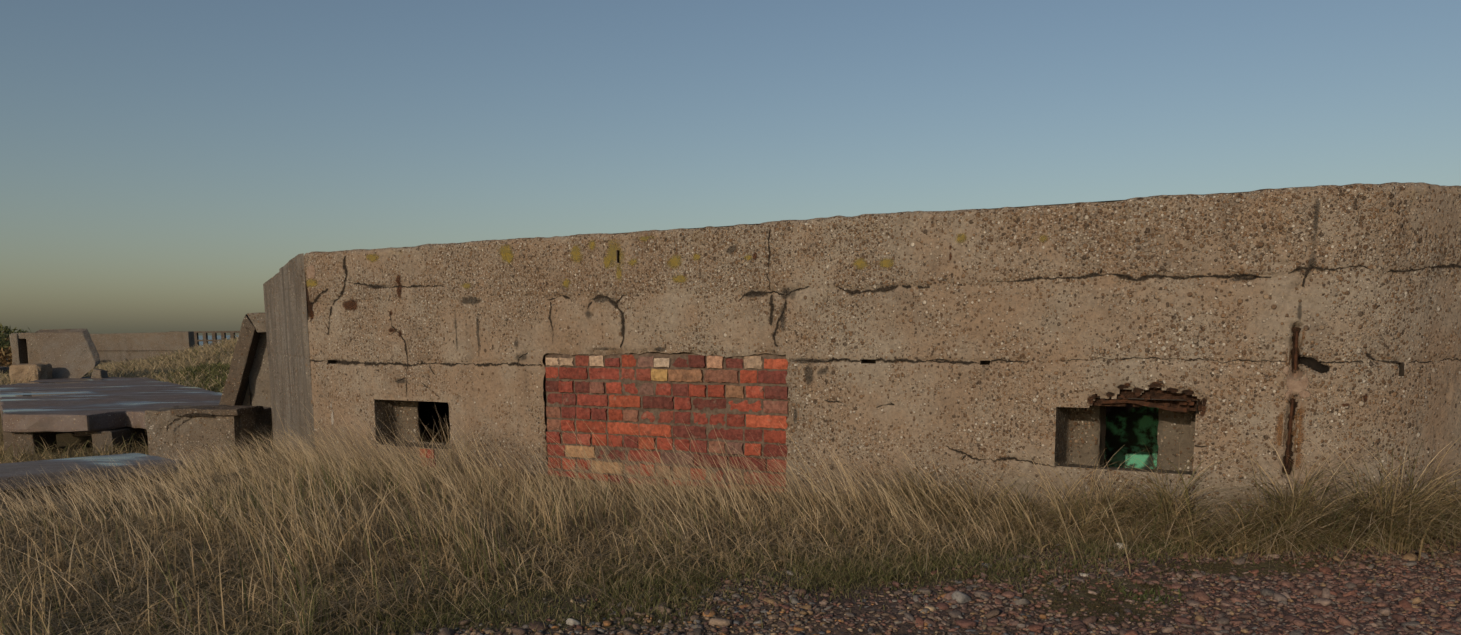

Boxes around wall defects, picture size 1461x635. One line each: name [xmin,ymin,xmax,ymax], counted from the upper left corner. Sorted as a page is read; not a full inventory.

crack [310,256,625,398]
crack [739,230,1030,365]
crack [996,264,1461,287]
crack [1067,353,1461,364]